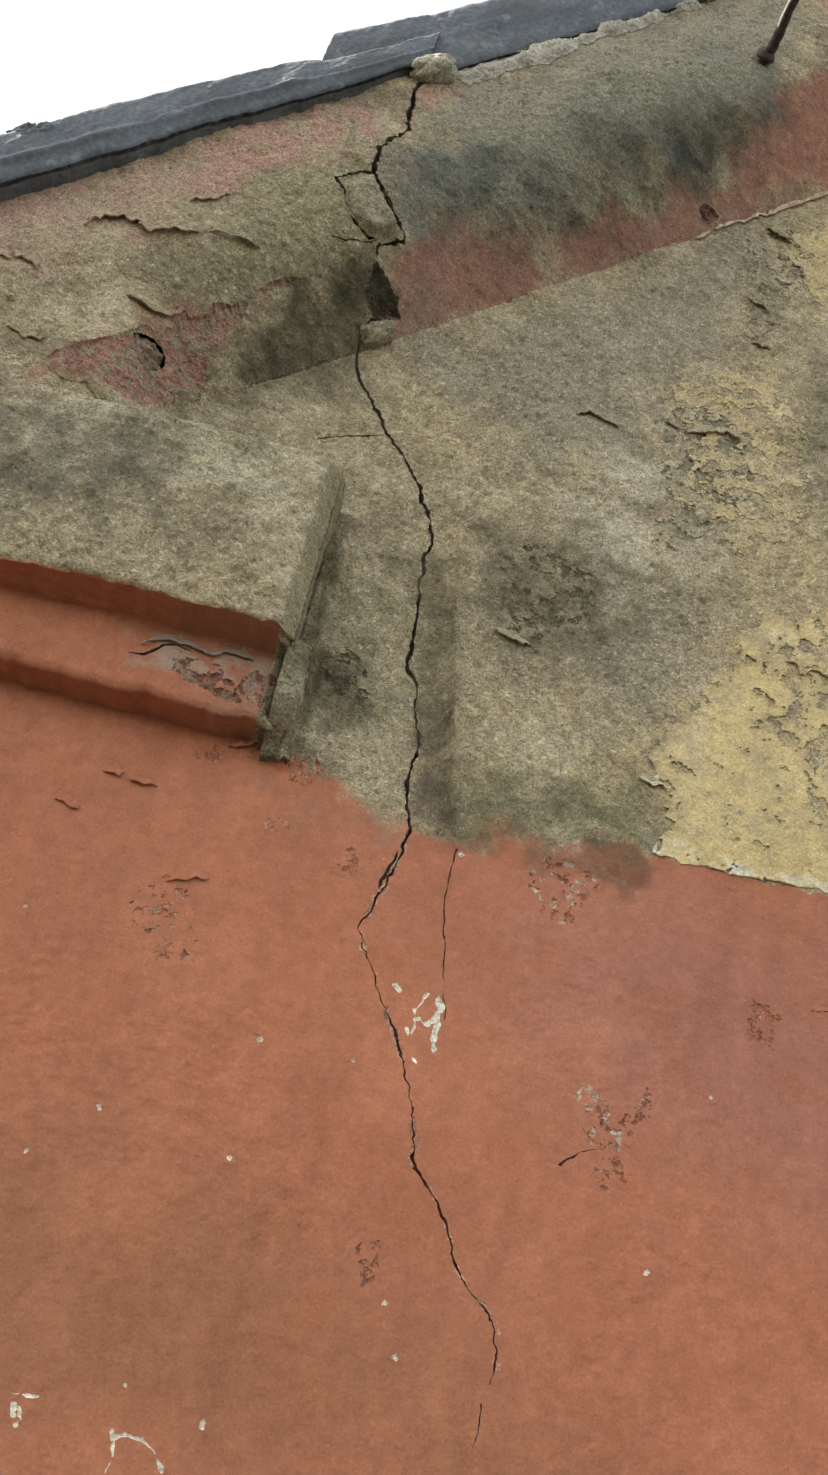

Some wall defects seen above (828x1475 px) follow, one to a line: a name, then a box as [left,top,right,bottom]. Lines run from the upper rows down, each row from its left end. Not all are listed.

flaking render [84,210,261,249]
crack [331,82,422,249]
peeling [41,276,300,416]
damp [239,264,386,383]
spalling [141,634,278,719]
peeling [639,607,828,894]
crack [317,318,501,1453]
peeling [575,1085,657,1191]